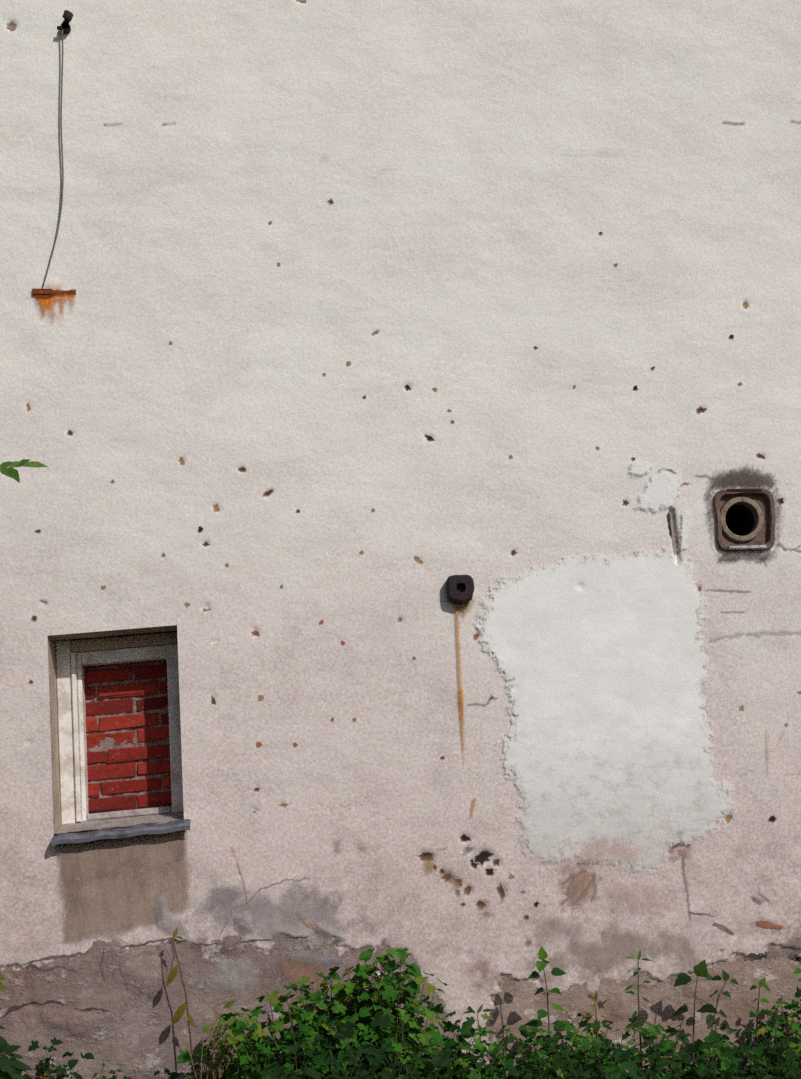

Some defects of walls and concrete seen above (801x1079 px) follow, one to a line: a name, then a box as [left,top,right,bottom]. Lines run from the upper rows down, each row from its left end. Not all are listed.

rust [32,289,76,313]
rust [455,602,470,750]
damp [61,830,188,940]
flaking render [418,852,490,916]
flaking render [460,834,515,901]
flaking render [757,920,783,929]
flaking render [0,935,461,1079]
flaking render [485,944,801,1079]